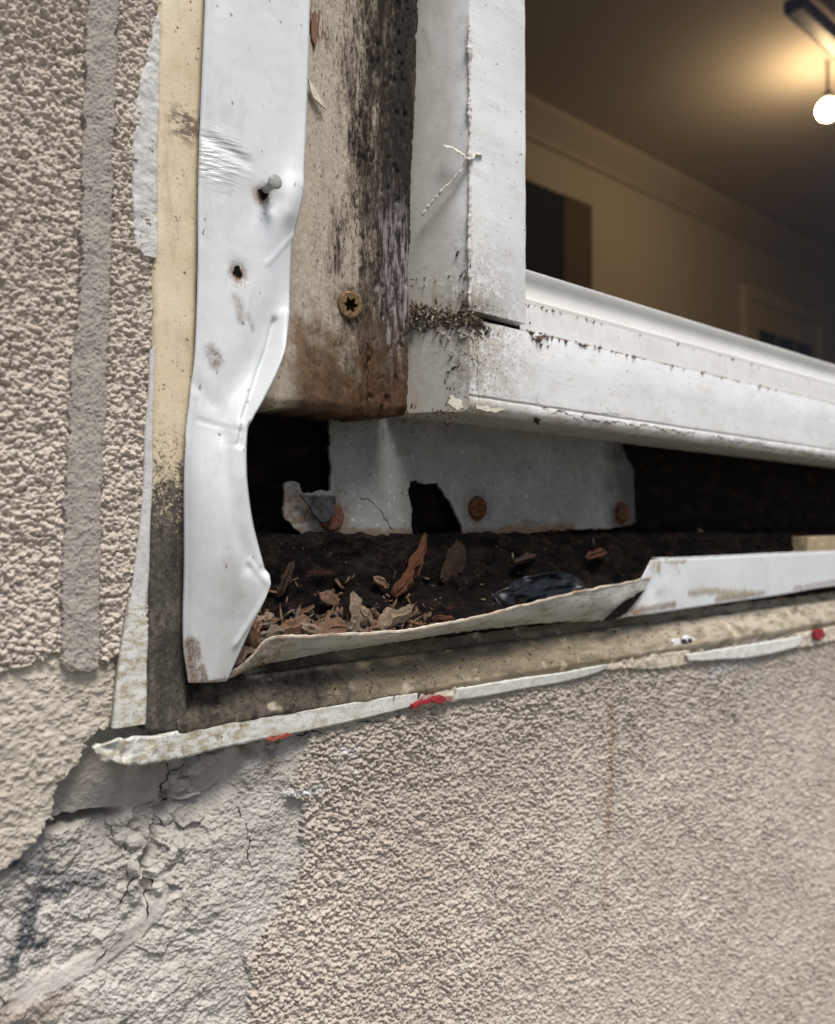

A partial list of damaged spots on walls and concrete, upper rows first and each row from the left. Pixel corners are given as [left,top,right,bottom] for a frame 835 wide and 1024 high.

crack [104,820,153,919]
spalling [0,652,311,1024]
crack [152,759,186,826]